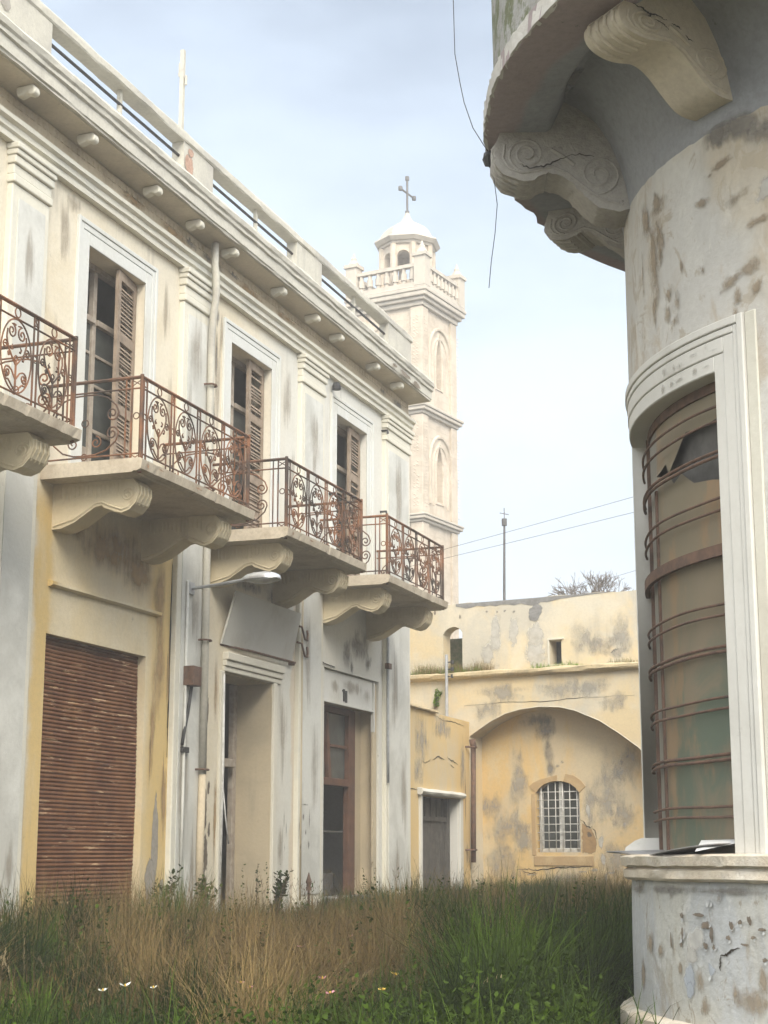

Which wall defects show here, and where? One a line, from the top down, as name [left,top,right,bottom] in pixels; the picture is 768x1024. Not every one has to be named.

crack [633,3,692,41]
leakage [707,114,768,145]
crack [523,153,594,169]
leakage [642,194,679,324]
leakage [725,260,760,315]
leakage [482,615,545,668]
peeling [144,793,164,904]
flaking render [582,804,607,880]
peeling [670,900,766,951]
crack [719,948,740,971]